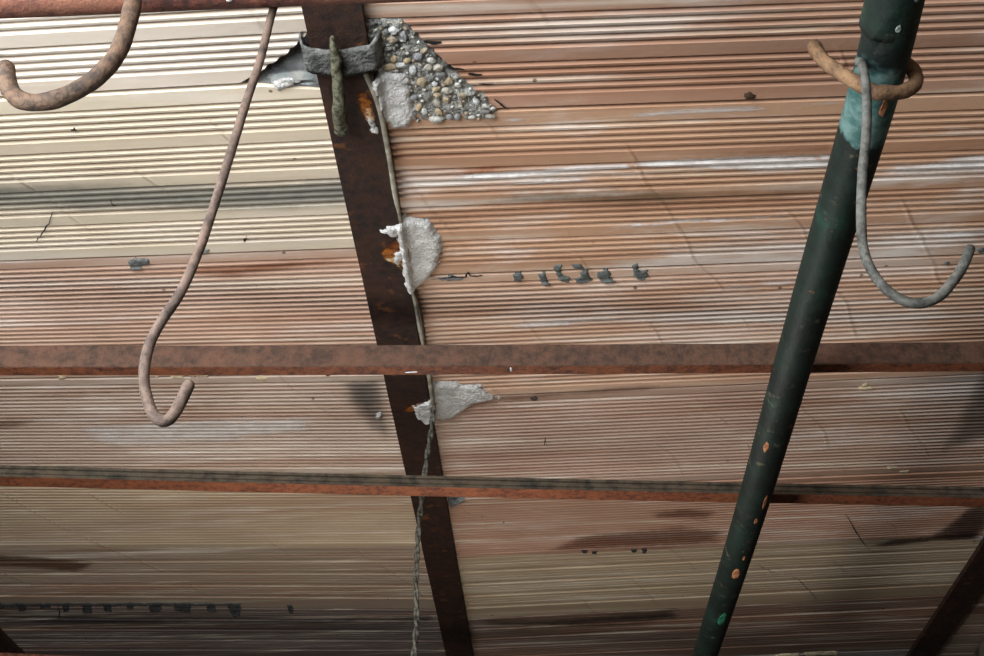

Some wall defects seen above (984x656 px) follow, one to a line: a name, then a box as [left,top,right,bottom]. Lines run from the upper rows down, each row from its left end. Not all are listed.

spalling [366,17,497,124]
peeling [380,226,397,237]
peeling [412,399,431,425]
water stain [0,557,86,569]